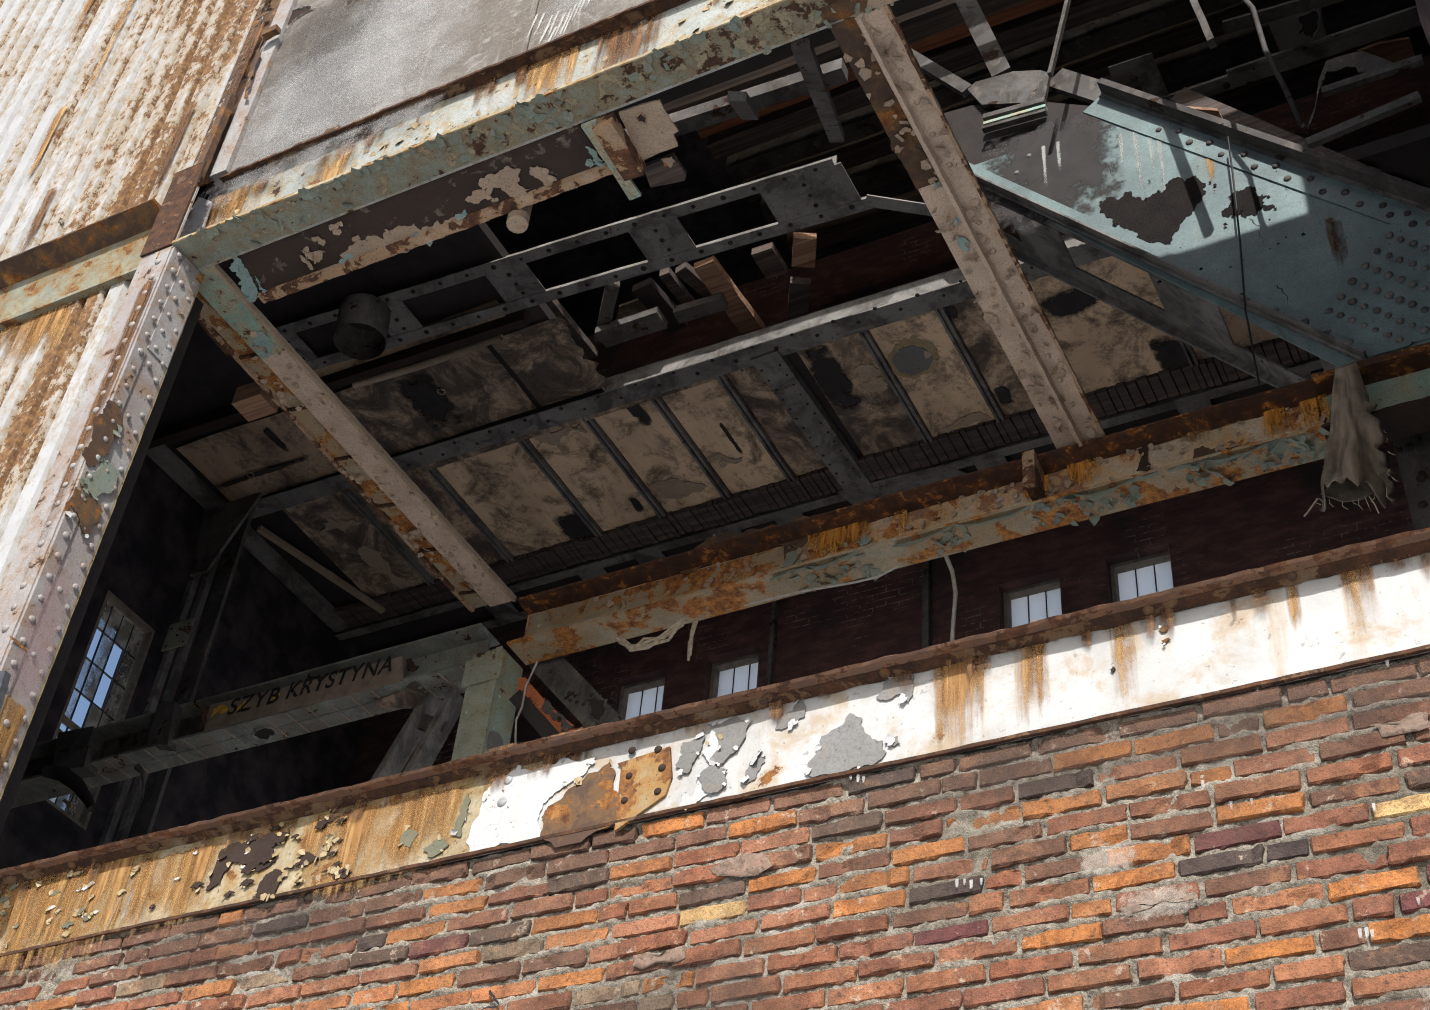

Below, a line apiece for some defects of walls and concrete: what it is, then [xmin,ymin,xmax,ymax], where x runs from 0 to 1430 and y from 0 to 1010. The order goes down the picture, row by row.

corrosion [157,104,195,181]
corrosion [26,187,56,243]
peeling [188,83,574,304]
peeling [1099,166,1277,248]
corrosion [0,304,71,355]
corrosion [52,279,155,508]
peeling [63,400,123,538]
peeling [675,716,765,811]
peeling [804,713,900,778]
corrosion [0,820,272,973]
peeling [174,806,352,901]
corrosion [292,744,513,893]